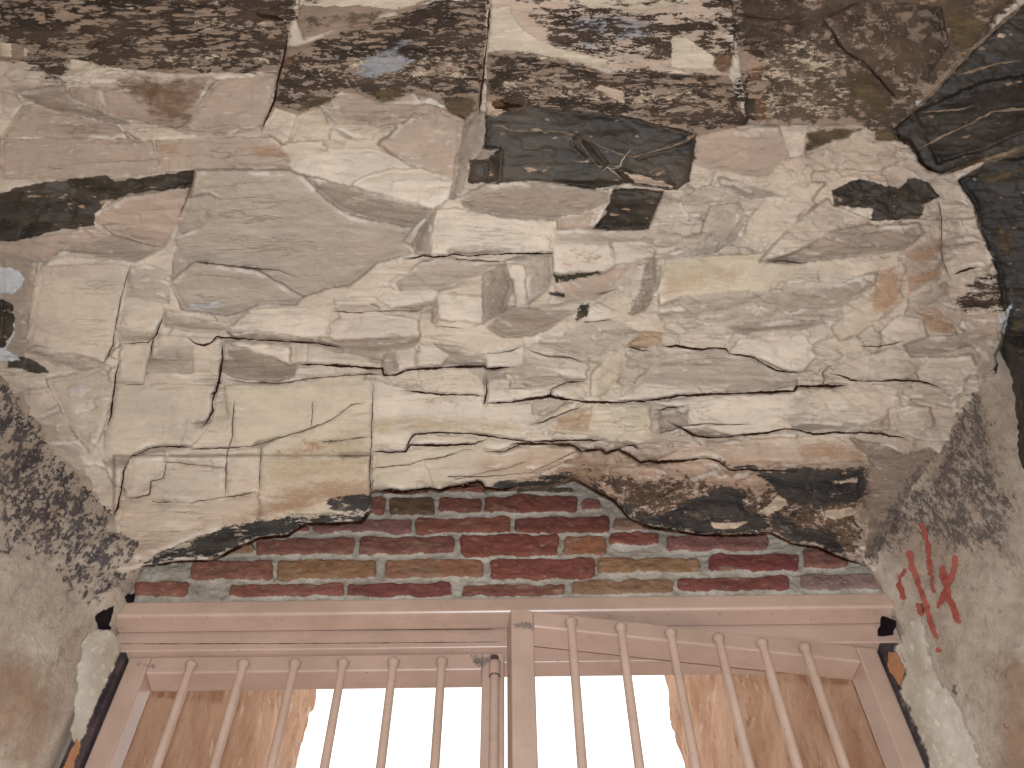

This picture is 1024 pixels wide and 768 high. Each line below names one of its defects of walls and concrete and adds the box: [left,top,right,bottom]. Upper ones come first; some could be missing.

leakage [570,0,684,48]
leakage [293,40,470,84]
crack [261,36,288,131]
leakage [299,95,332,111]
leakage [445,97,474,119]
leakage [503,72,736,111]
crack [198,261,291,276]
crack [104,271,163,425]
crack [114,336,942,567]
spalling [711,521,748,529]
spalling [759,495,789,516]
spalling [824,507,859,520]